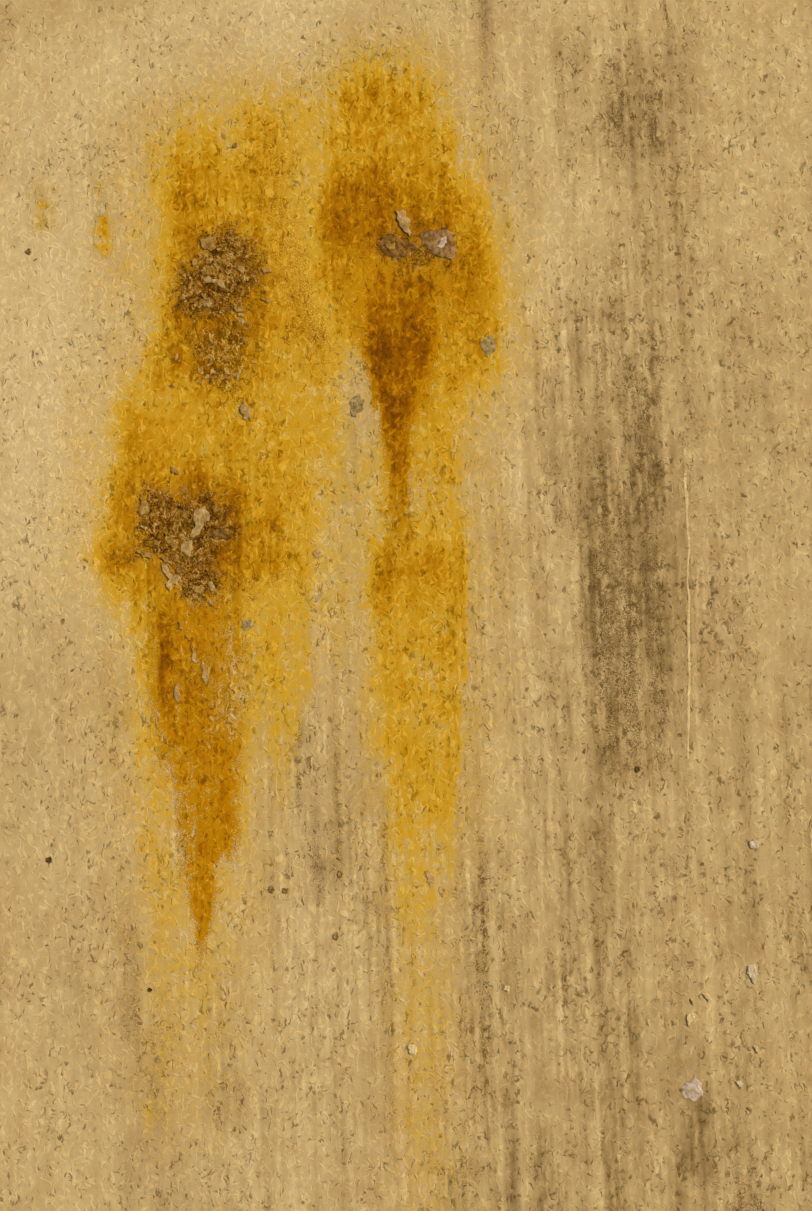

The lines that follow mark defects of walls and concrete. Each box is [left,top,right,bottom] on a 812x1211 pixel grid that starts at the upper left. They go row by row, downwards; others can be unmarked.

damp [522,24,697,210]
corrosion [23,0,562,1211]
damp [540,234,727,849]